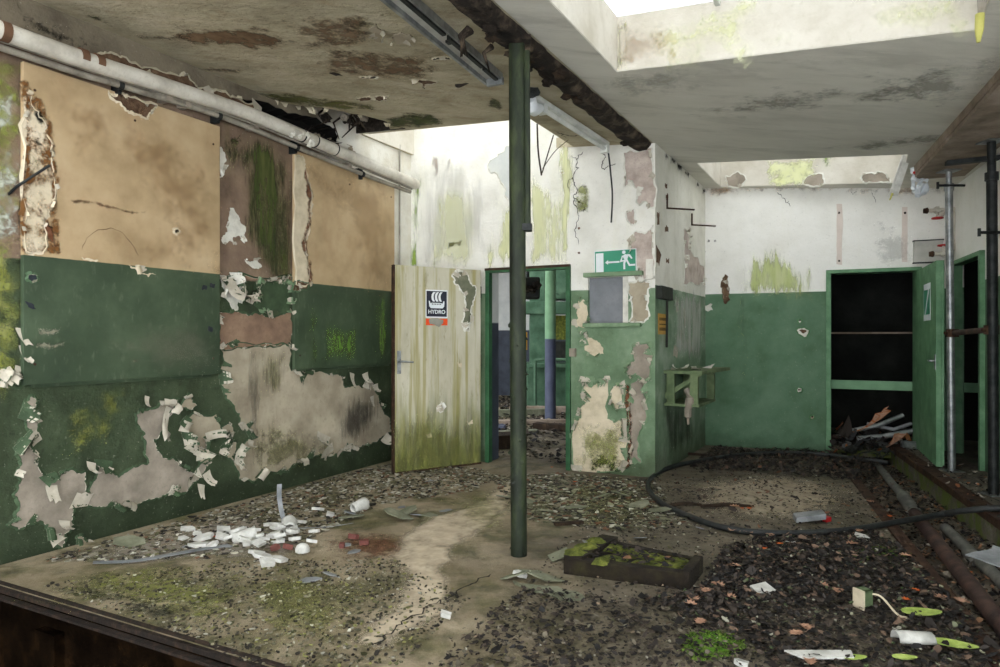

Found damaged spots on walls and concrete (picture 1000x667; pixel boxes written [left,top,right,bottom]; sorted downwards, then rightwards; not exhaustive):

damp [154,27,281,50]
damp [300,17,433,78]
spalling [98,51,355,152]
peeling [18,90,61,256]
flaking render [724,171,747,189]
flaking render [802,173,825,188]
flaking render [860,171,891,184]
flaking render [623,148,669,323]
peeling [0,155,391,549]
peeling [571,297,604,357]
peeling [569,341,654,473]